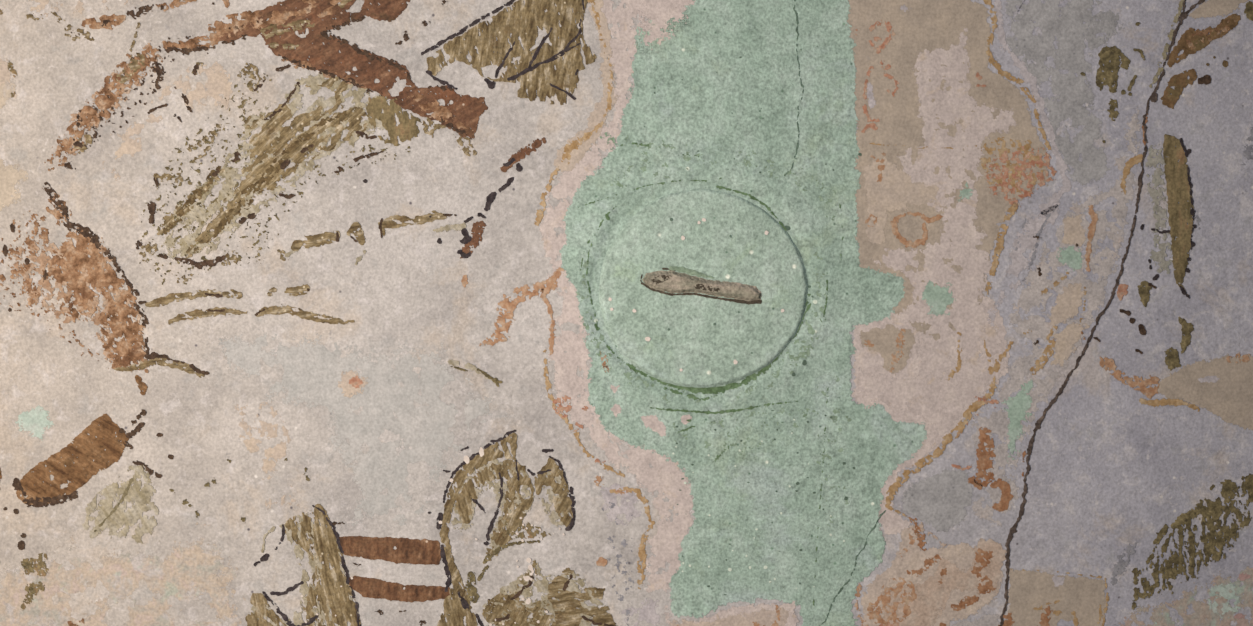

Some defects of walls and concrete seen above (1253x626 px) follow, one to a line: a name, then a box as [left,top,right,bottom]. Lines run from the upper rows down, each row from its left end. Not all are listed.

peeling [641,414,692,455]
flaking render [846,0,1124,341]
crack [999,0,1205,626]